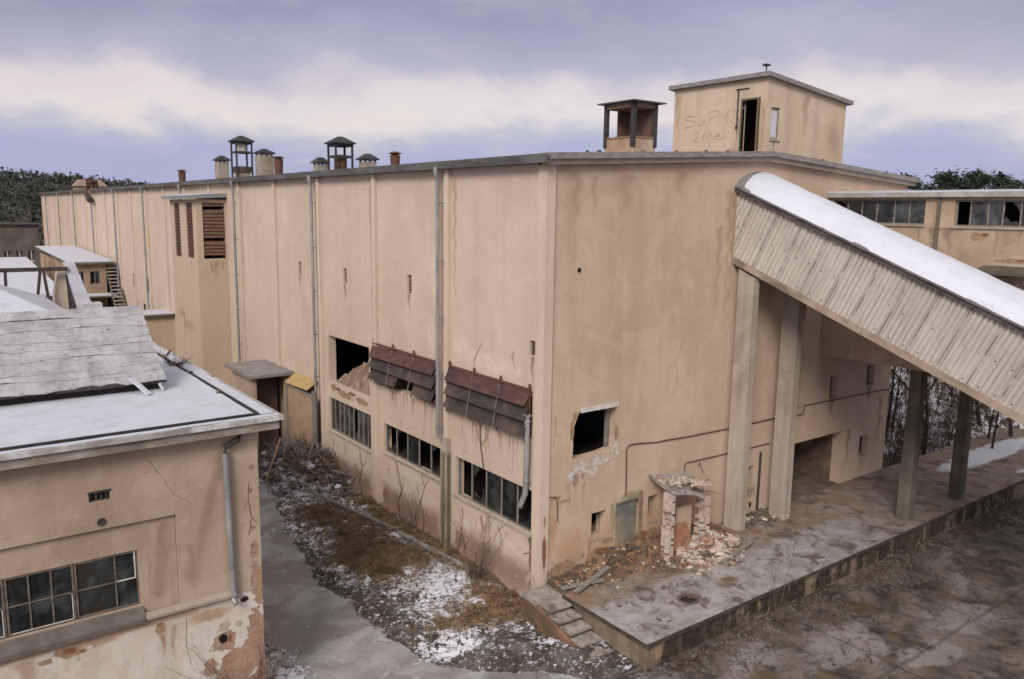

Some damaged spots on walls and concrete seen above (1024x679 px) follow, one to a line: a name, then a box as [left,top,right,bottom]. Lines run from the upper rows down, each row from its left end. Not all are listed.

spalling [331,384,368,407]
spalling [568,426,620,486]
crack [245,464,256,548]
flaking render [202,541,266,679]
spalling [38,645,94,666]